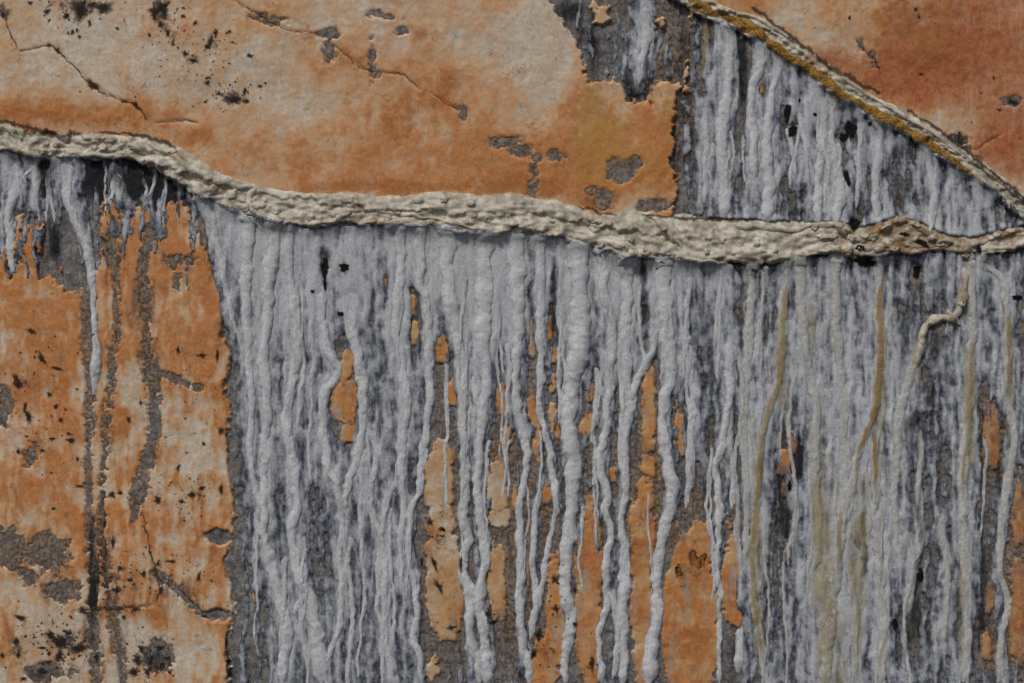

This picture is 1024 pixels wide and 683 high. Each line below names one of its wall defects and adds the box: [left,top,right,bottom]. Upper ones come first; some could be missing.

crack [237,1,317,34]
crack [0,23,197,148]
crack [339,49,456,108]
peeling [550,0,717,221]
peeling [731,33,766,199]
peeling [779,98,801,146]
corrosion [688,0,980,180]
peeling [489,136,567,198]
peeling [777,177,805,223]
peeling [849,174,870,231]
peeling [0,160,208,683]
damp [159,465,210,521]